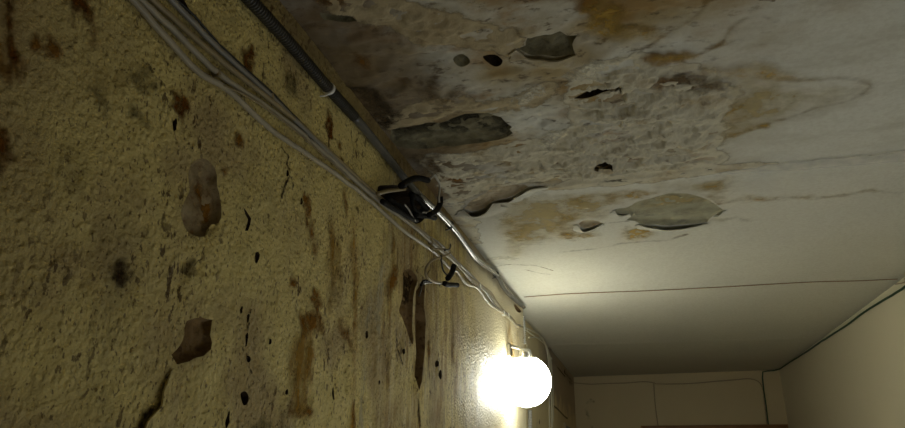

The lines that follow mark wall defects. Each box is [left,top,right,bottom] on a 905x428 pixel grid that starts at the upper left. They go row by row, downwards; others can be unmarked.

flaking render [320,0,778,244]
water stain [658,76,725,91]
flaking render [181,158,222,239]
water stain [500,197,600,240]
flaking render [138,317,212,428]
flaking render [399,269,426,393]